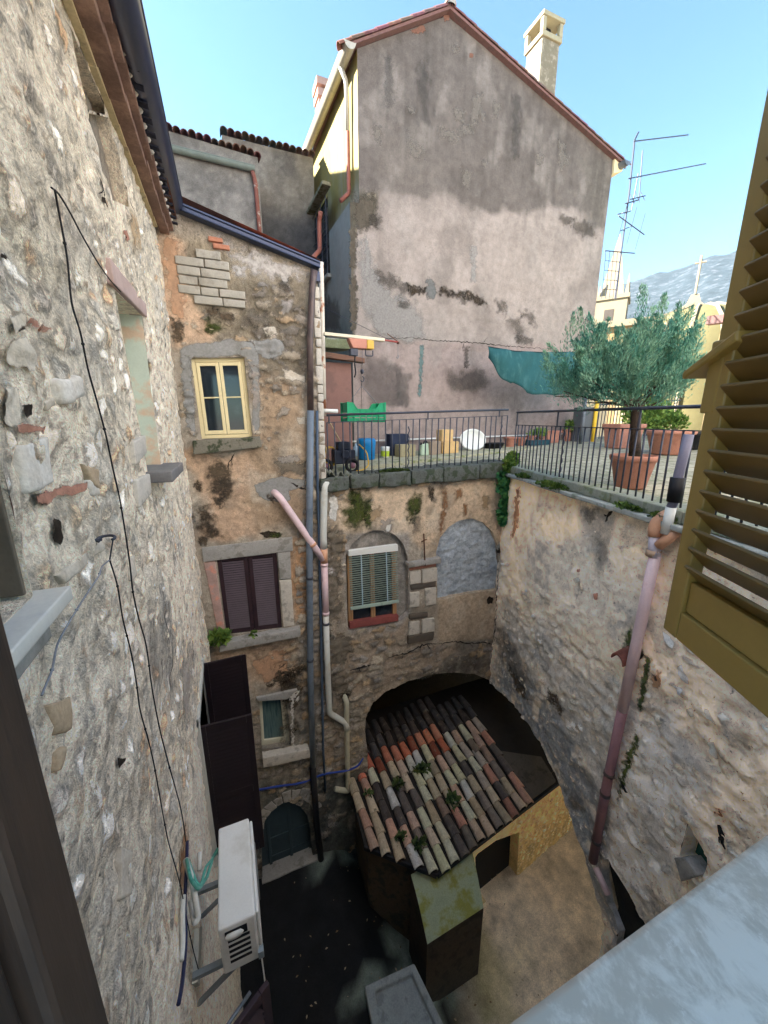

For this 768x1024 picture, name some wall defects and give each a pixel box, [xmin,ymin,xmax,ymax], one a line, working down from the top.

spalling [349,193,378,331]
water stain [358,239,427,397]
water stain [439,246,487,306]
rust [511,489,519,537]
crack [350,570,499,672]